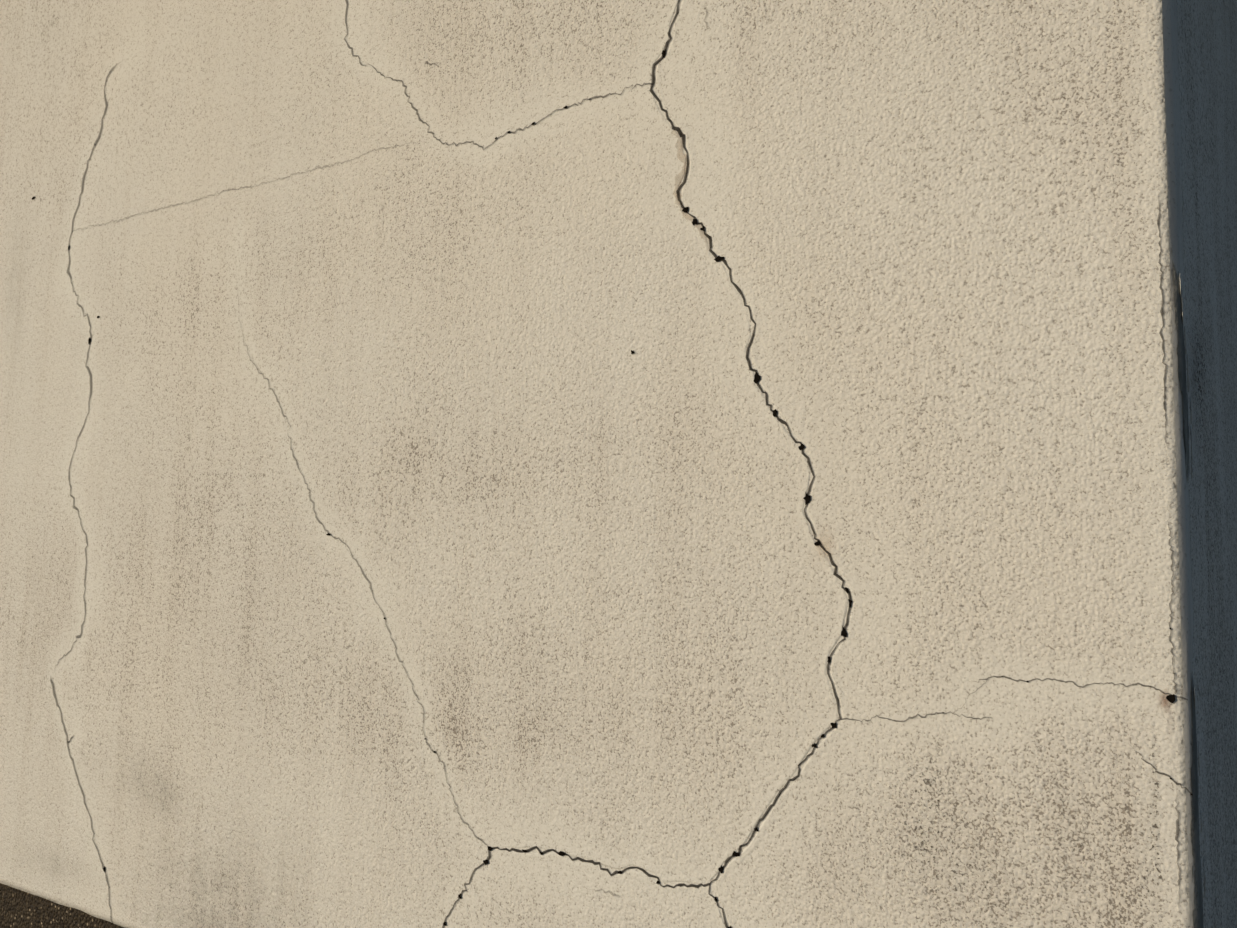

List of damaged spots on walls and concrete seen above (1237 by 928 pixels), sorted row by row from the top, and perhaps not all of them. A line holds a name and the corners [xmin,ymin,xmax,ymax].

crack [344,0,981,928]
crack [979,531,1188,701]
crack [1141,757,1193,795]